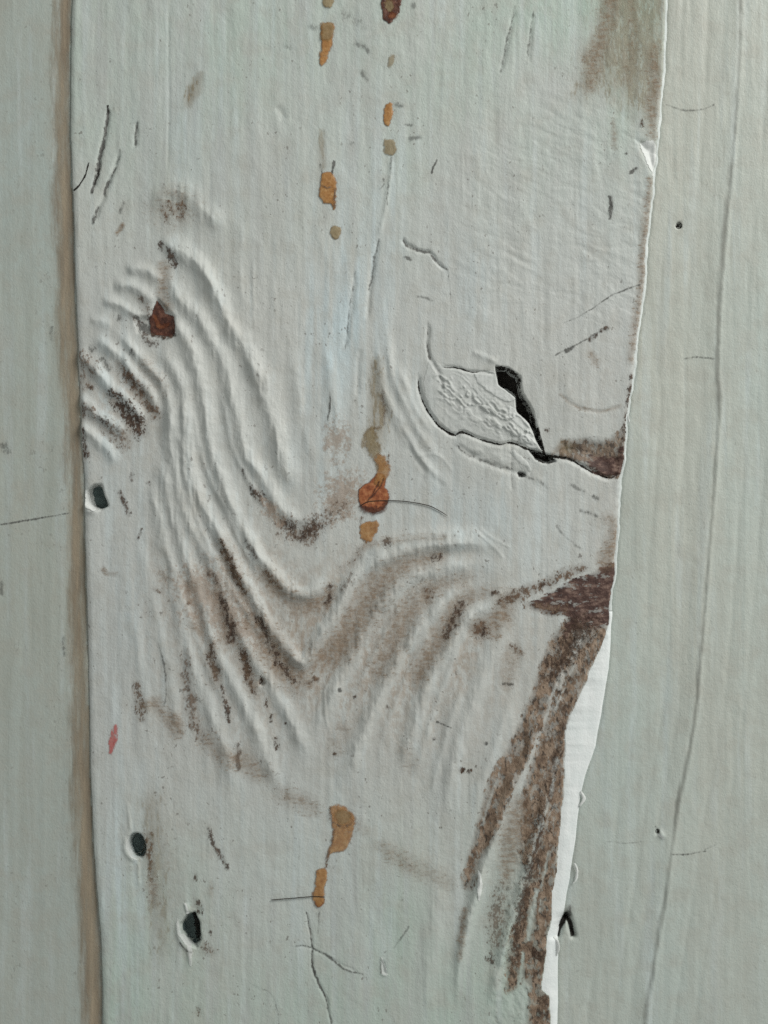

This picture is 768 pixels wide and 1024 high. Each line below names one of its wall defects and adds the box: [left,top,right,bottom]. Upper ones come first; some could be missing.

damp [82,363,160,458]
crack [418,333,615,479]
damp [414,533,616,1024]
spalling [542,611,612,1024]
crack [303,912,360,1024]